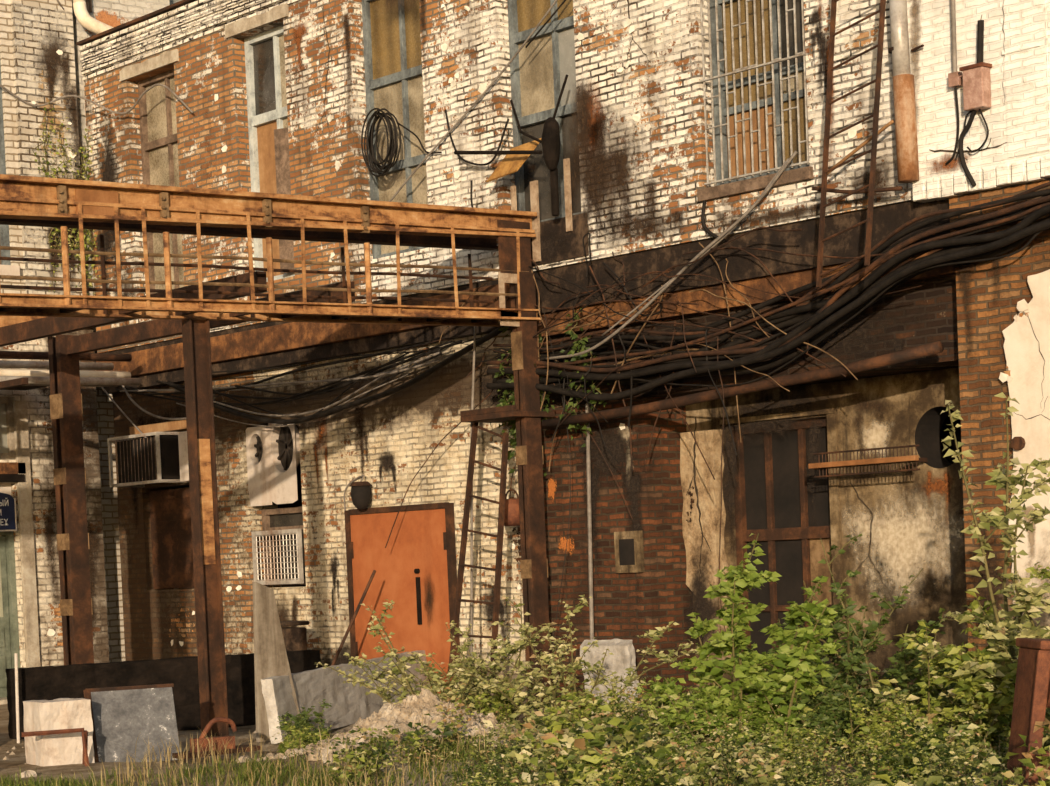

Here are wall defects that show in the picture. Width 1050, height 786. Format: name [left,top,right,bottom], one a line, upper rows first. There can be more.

peeling [577,18,635,60]
peeling [617,60,667,81]
rust [810,0,834,127]
leakage [47,57,82,180]
leakage [97,126,117,182]
peeling [302,78,341,198]
leakage [571,84,682,243]
spalling [1014,299,1029,321]
spalling [999,365,1013,382]
crack [1014,316,1050,420]
leakage [355,413,367,465]
leakage [849,500,960,592]